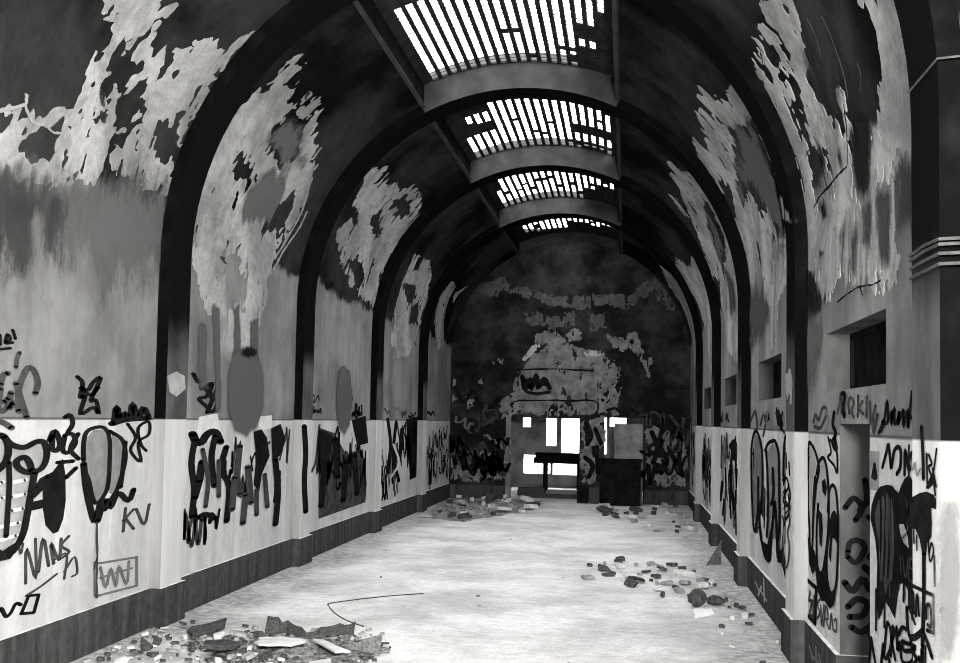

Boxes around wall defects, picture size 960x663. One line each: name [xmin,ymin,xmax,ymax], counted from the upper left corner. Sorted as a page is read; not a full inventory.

water stain [0,166,167,305]
peeling [0,0,255,198]
peeling [192,54,324,363]
peeling [336,166,422,308]
peeling [391,253,467,359]
peeling [451,161,738,488]
peeling [692,84,786,352]
peeling [751,0,911,303]
crack [807,16,861,208]
water stain [807,115,912,392]